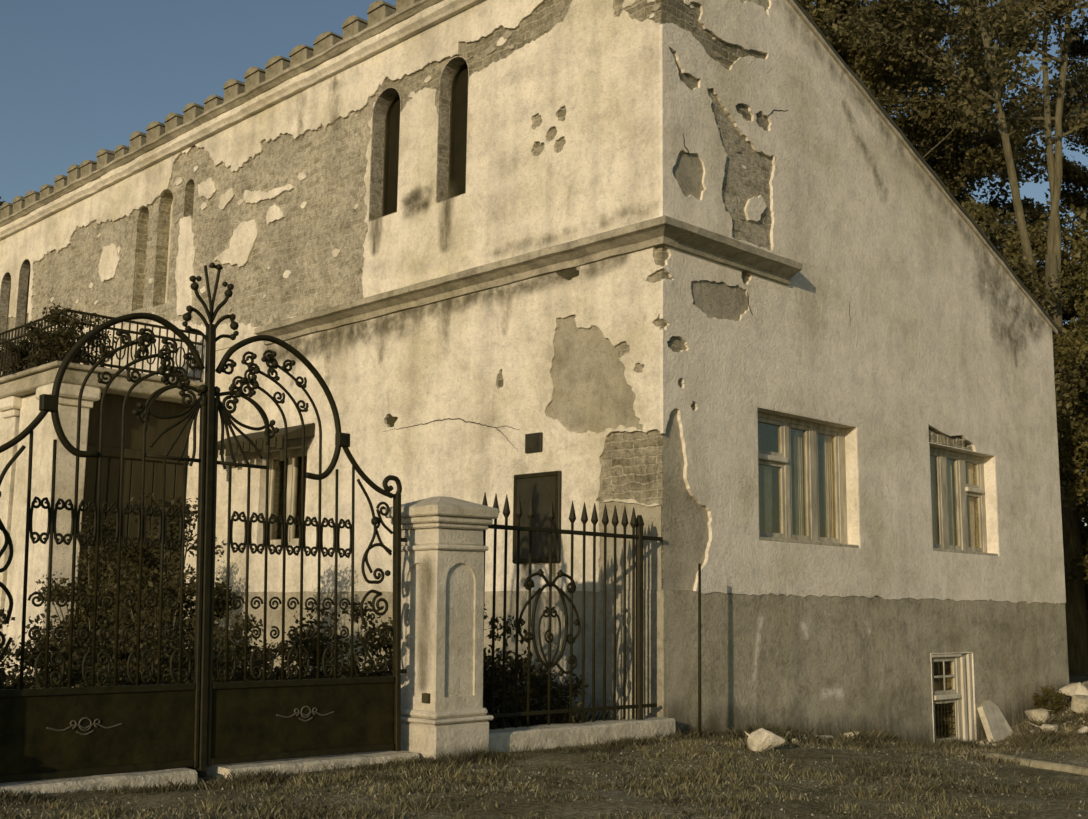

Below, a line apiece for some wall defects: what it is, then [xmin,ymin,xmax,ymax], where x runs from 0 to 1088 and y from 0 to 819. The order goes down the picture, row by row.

flaking render [615,0,769,70]
flaking render [9,0,572,339]
flaking render [670,50,773,251]
flaking render [558,268,579,280]
spalling [648,246,672,283]
flaking render [691,272,749,322]
crack [383,418,519,450]
flaking render [546,315,709,591]